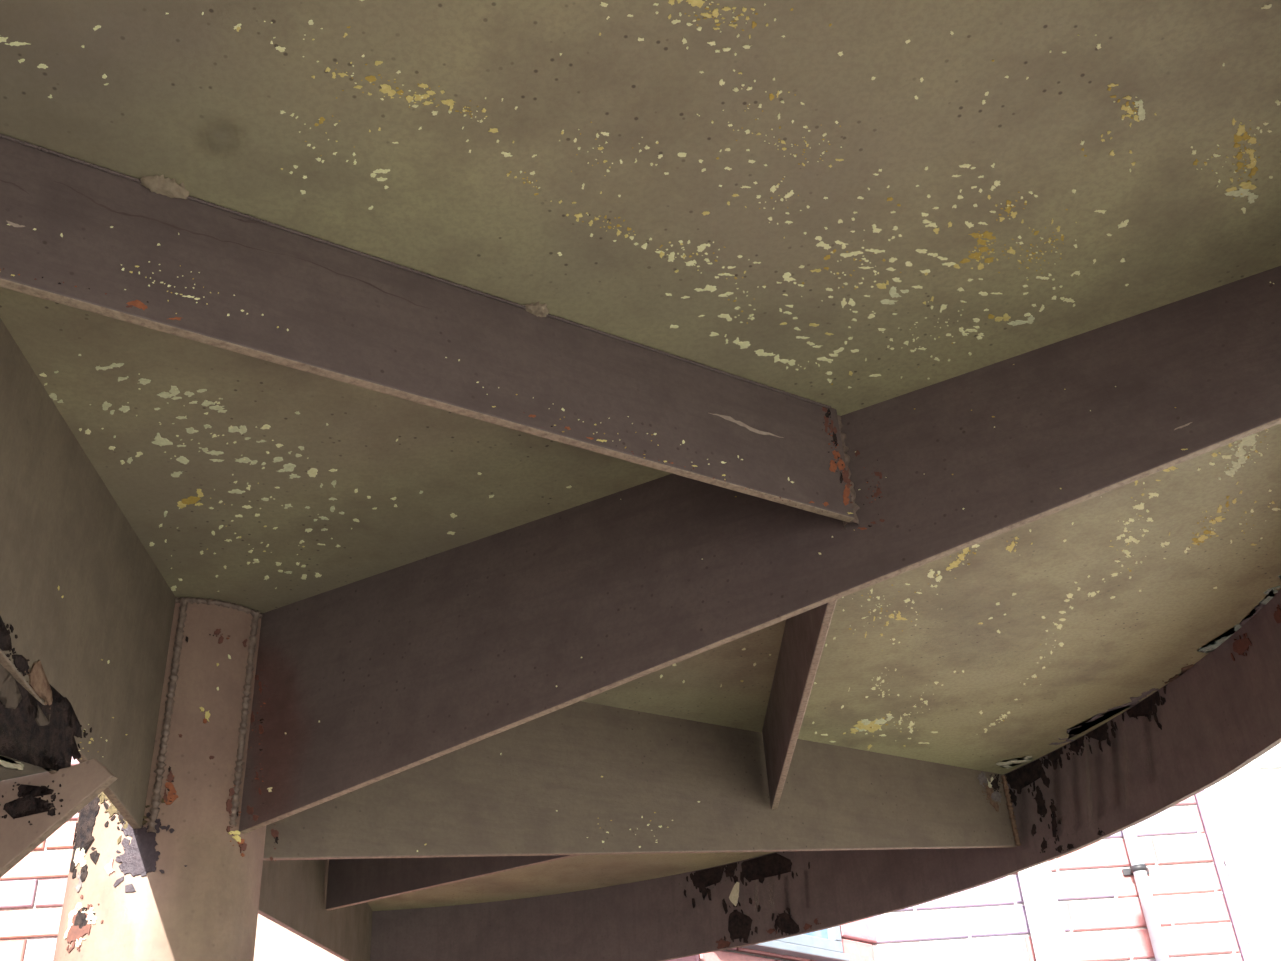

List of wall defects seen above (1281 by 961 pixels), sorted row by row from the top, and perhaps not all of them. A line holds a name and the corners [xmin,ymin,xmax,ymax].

peeling [559,0,843,194]
peeling [303,54,1096,388]
peeling [79,363,359,592]
corrosion [774,407,885,530]
peeling [825,543,980,651]
peeling [979,466,1178,733]
peeling [0,756,24,770]
peeling [98,792,175,893]
peeling [680,851,821,949]
peeling [812,667,943,750]
corrosion [1031,786,1074,853]
peeling [996,575,1281,806]